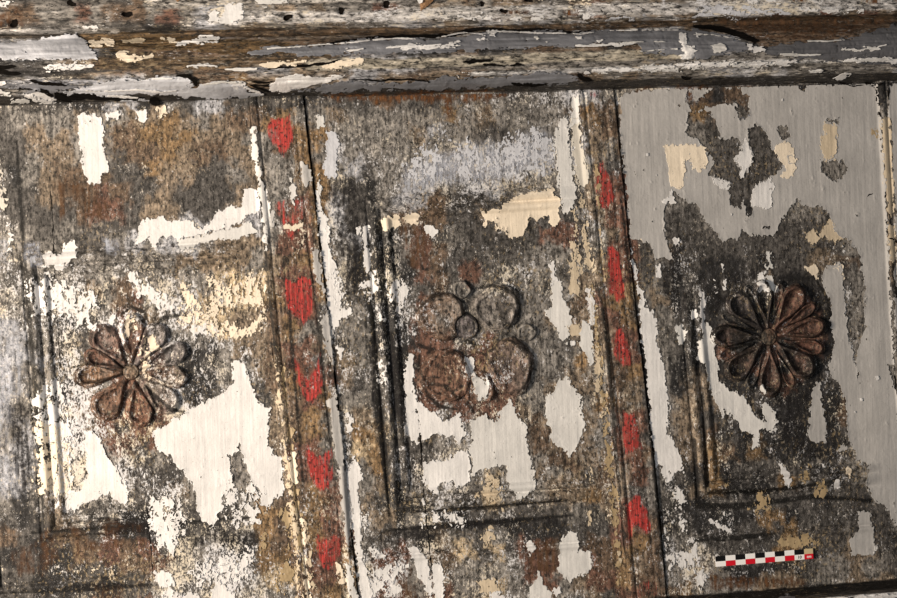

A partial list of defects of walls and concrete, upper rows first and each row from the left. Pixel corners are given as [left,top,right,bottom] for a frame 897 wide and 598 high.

peeling [0,0,897,185]
crack [693,24,760,43]
peeling [24,240,100,332]
peeling [108,266,267,381]
peeling [135,126,303,251]
peeling [289,114,412,365]
peeling [396,95,624,585]
peeling [619,73,897,591]
peeling [30,376,130,513]
peeling [140,360,317,598]
peeling [326,389,447,598]
peeling [528,531,593,598]